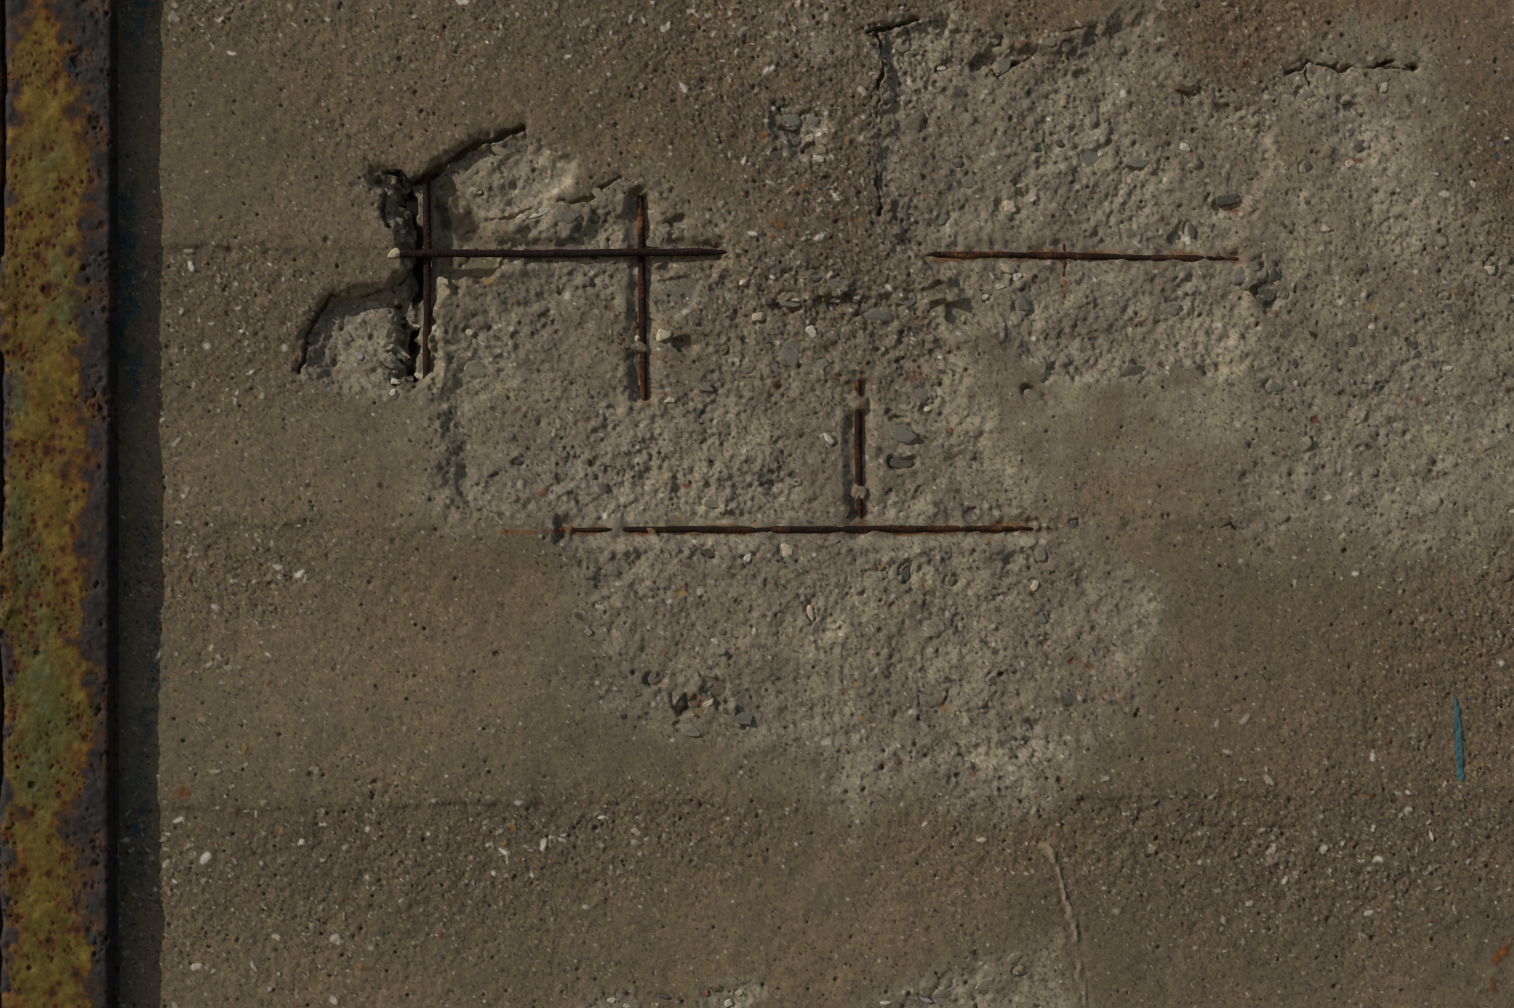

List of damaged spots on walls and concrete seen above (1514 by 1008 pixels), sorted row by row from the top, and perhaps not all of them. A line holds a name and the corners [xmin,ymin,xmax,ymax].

crack [865,15,924,229]
spalling [297,0,1514,821]